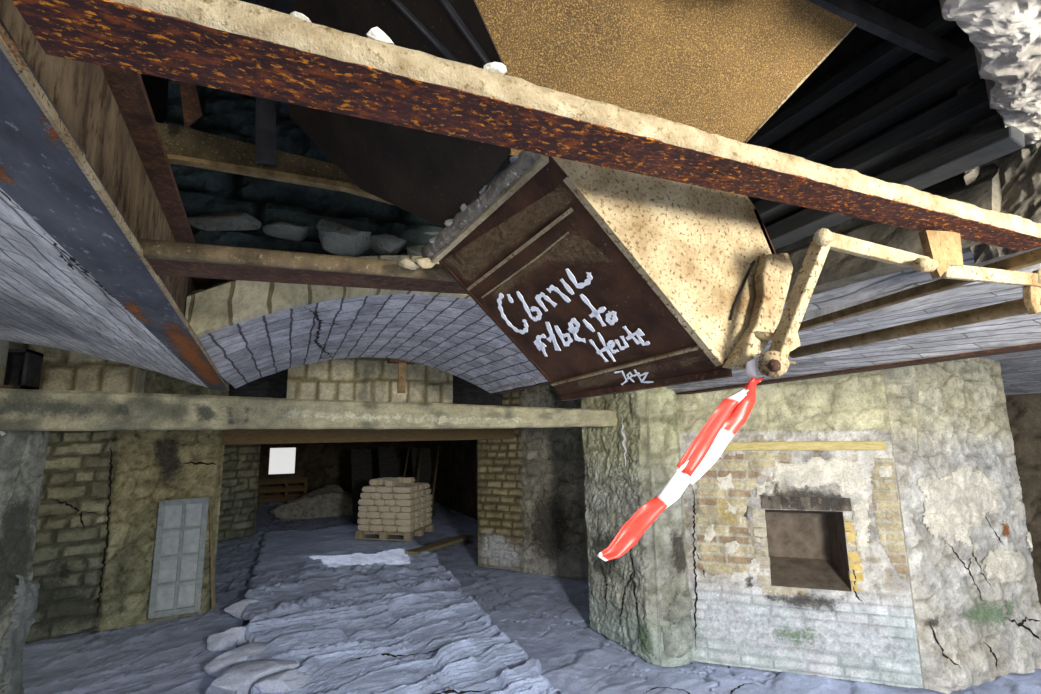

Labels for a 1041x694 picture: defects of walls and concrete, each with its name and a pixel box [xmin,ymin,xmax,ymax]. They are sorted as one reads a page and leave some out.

rust [121,296,224,385]
crack [306,308,341,357]
leakage [0,496,33,618]
crack [603,548,640,646]
spalling [695,451,907,578]
crack [947,516,1040,639]
crack [931,626,960,667]